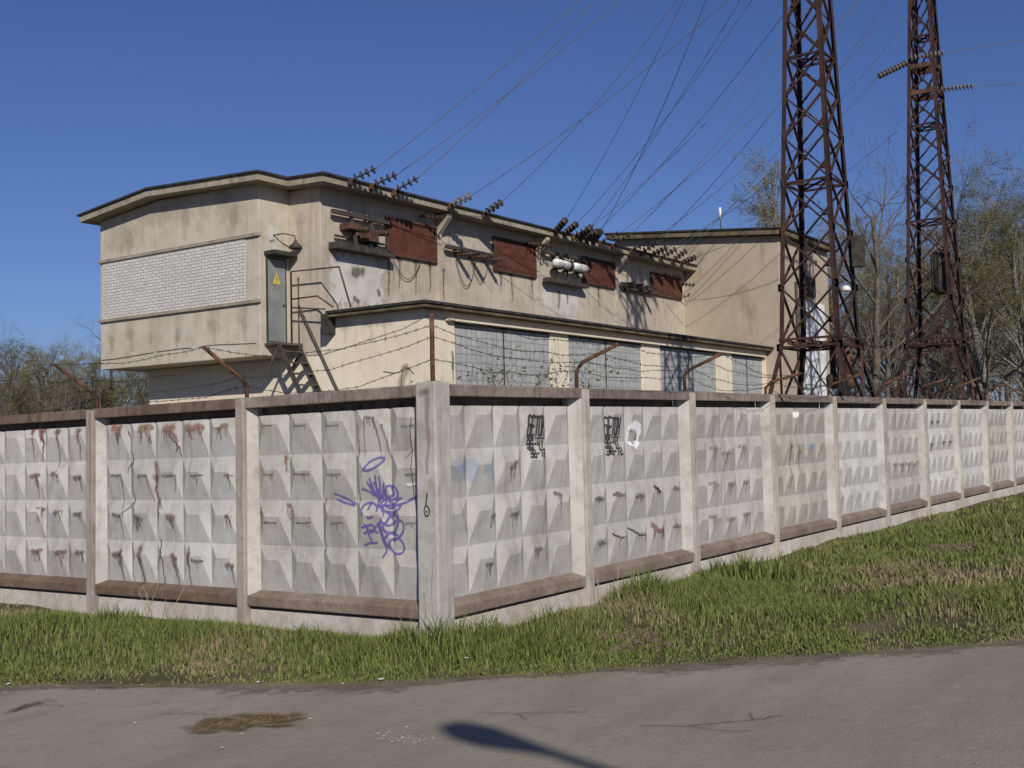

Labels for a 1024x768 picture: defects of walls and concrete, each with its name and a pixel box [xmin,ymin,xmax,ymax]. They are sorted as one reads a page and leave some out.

rust [30,429,60,492]
crack [119,431,137,528]
rust [154,462,175,526]
rust [138,424,228,446]
rust [112,543,145,587]